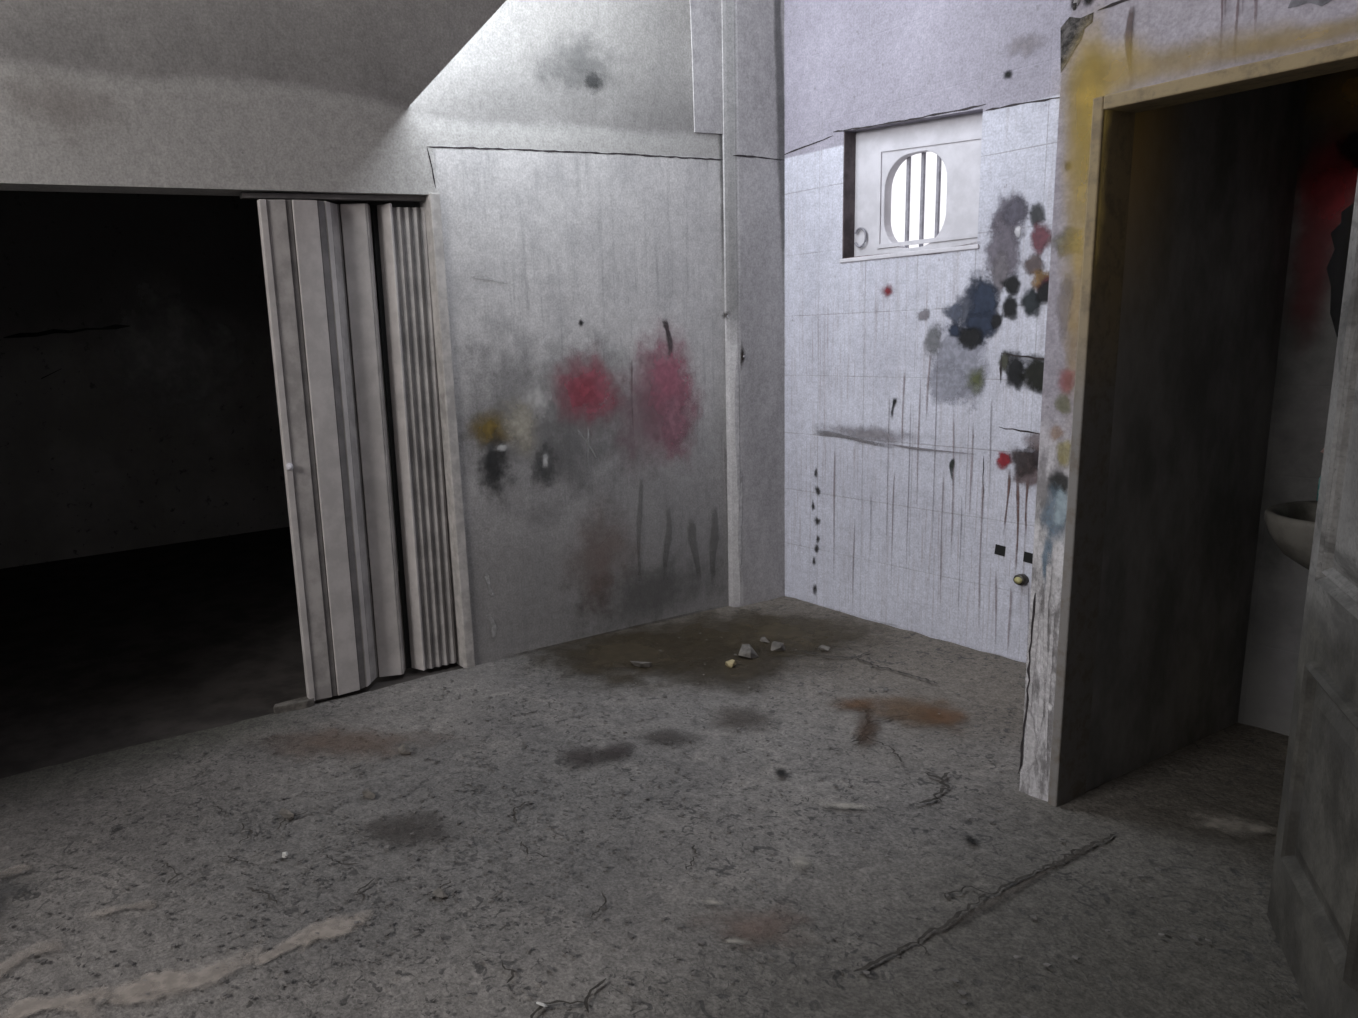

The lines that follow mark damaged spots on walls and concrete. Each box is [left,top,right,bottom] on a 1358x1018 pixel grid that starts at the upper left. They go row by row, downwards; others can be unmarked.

flaking render [1060,0,1094,72]
peeling [1288,0,1332,8]
damp [586,73,601,87]
damp [558,612,868,683]
crack [854,834,1115,972]